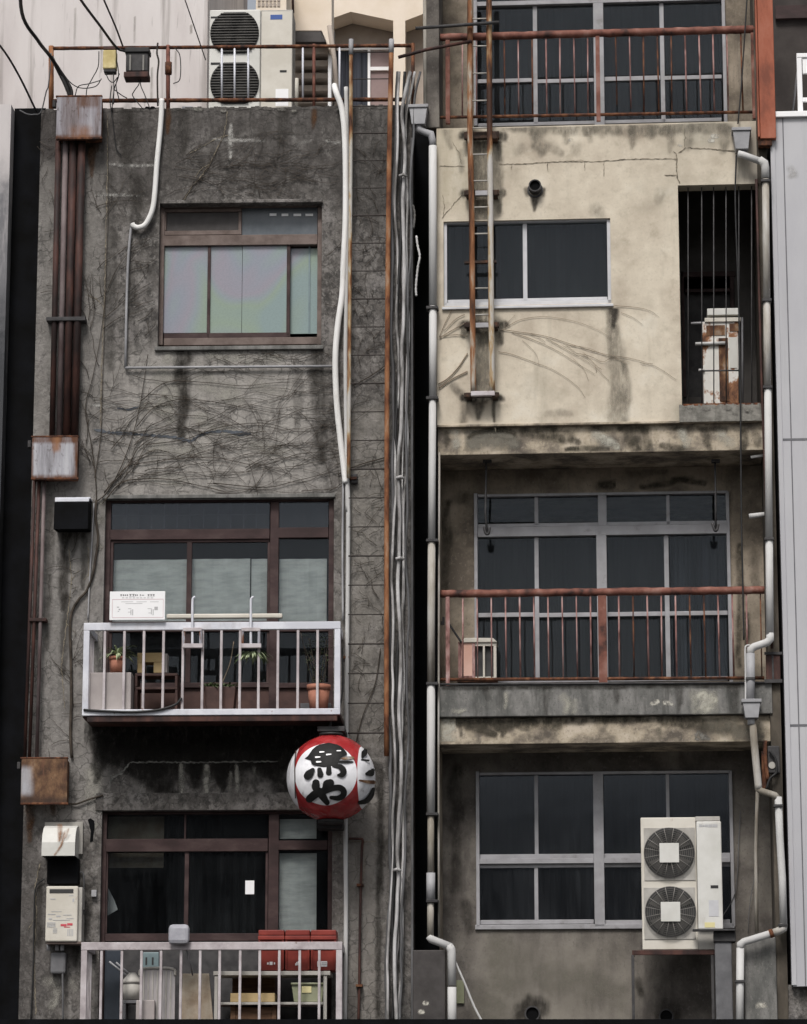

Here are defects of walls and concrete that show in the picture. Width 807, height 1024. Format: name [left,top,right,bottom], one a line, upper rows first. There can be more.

crack [499,129,735,183]
water stain [610,308,618,336]
water stain [175,351,191,442]
water stain [466,427,609,451]
water stain [616,388,685,451]
water stain [455,716,760,739]